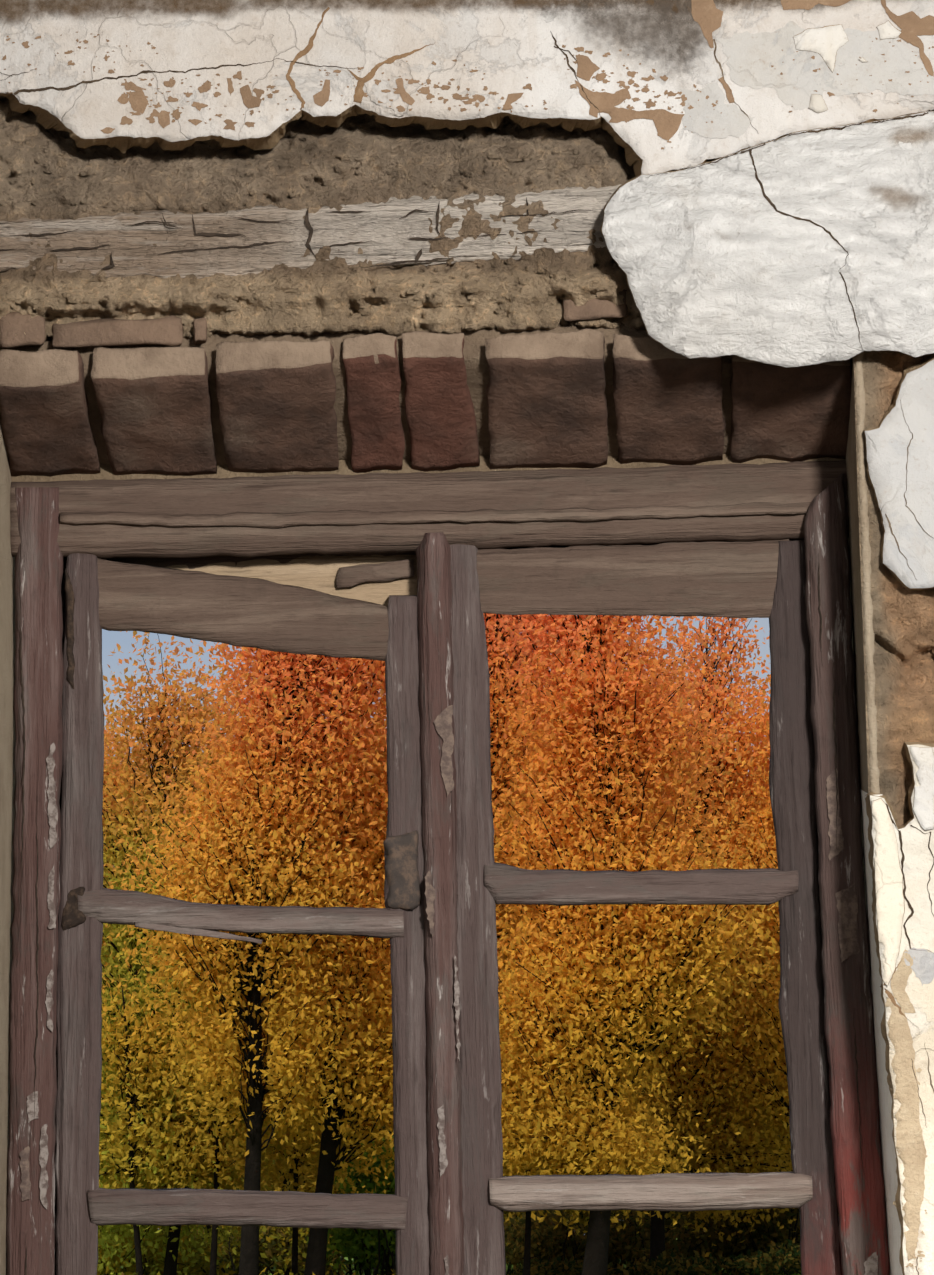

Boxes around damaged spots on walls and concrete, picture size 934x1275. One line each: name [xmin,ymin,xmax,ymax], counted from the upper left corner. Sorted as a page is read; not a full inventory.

crack [0,7,431,110]
flaking render [0,0,934,349]
crack [646,39,930,350]
flaking render [853,351,934,1270]
crack [880,803,934,1018]
crack [911,1043,934,1125]